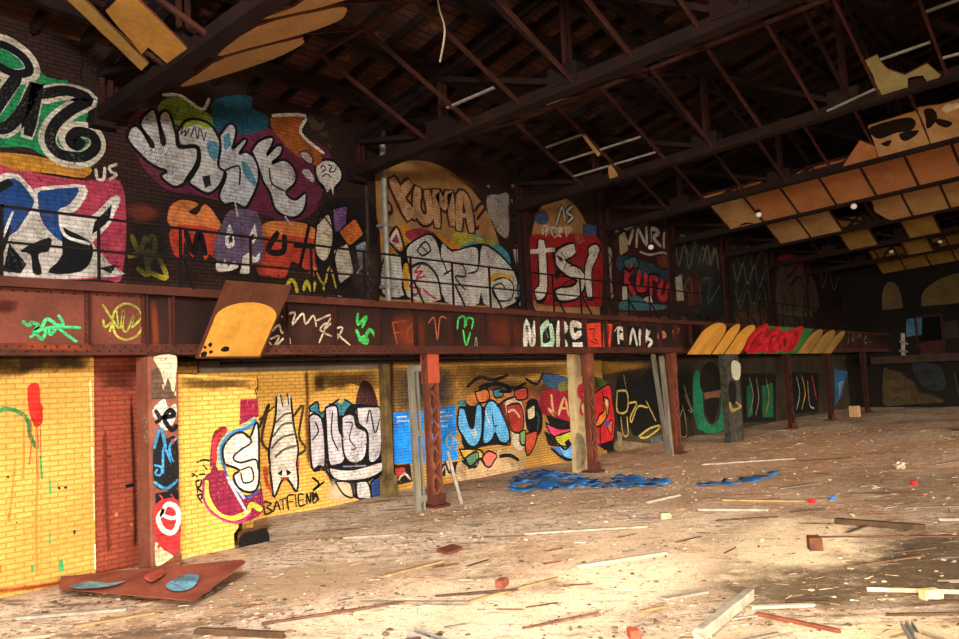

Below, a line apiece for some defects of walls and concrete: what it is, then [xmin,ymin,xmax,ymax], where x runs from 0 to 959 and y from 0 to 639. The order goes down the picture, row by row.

peeling [868,103,959,146]